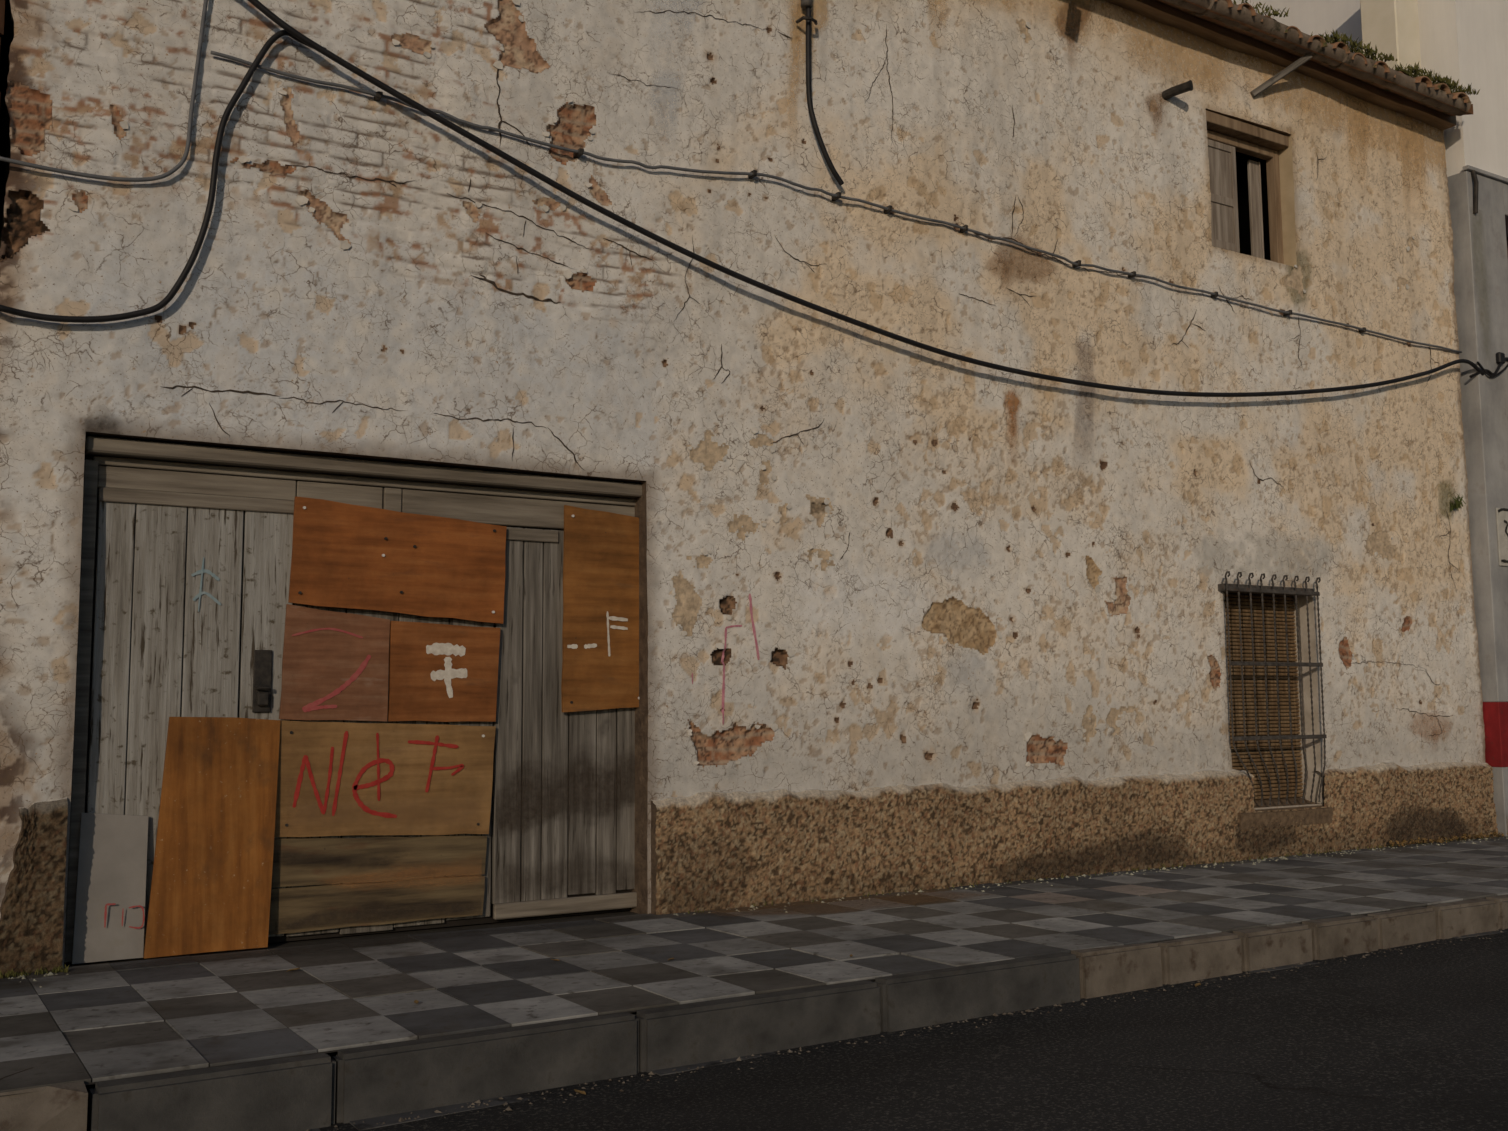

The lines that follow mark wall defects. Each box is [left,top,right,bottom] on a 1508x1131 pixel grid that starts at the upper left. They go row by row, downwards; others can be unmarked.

spalling [484,0,550,74]
spalling [5,80,52,156]
spalling [542,97,596,165]
crack [868,24,894,145]
spalling [0,189,50,262]
spalling [295,189,351,250]
spalling [563,268,597,292]
crack [160,385,584,470]
spalling [922,596,1018,655]
spalling [1066,542,1140,639]
spalling [688,708,778,767]
spalling [1024,700,1157,767]